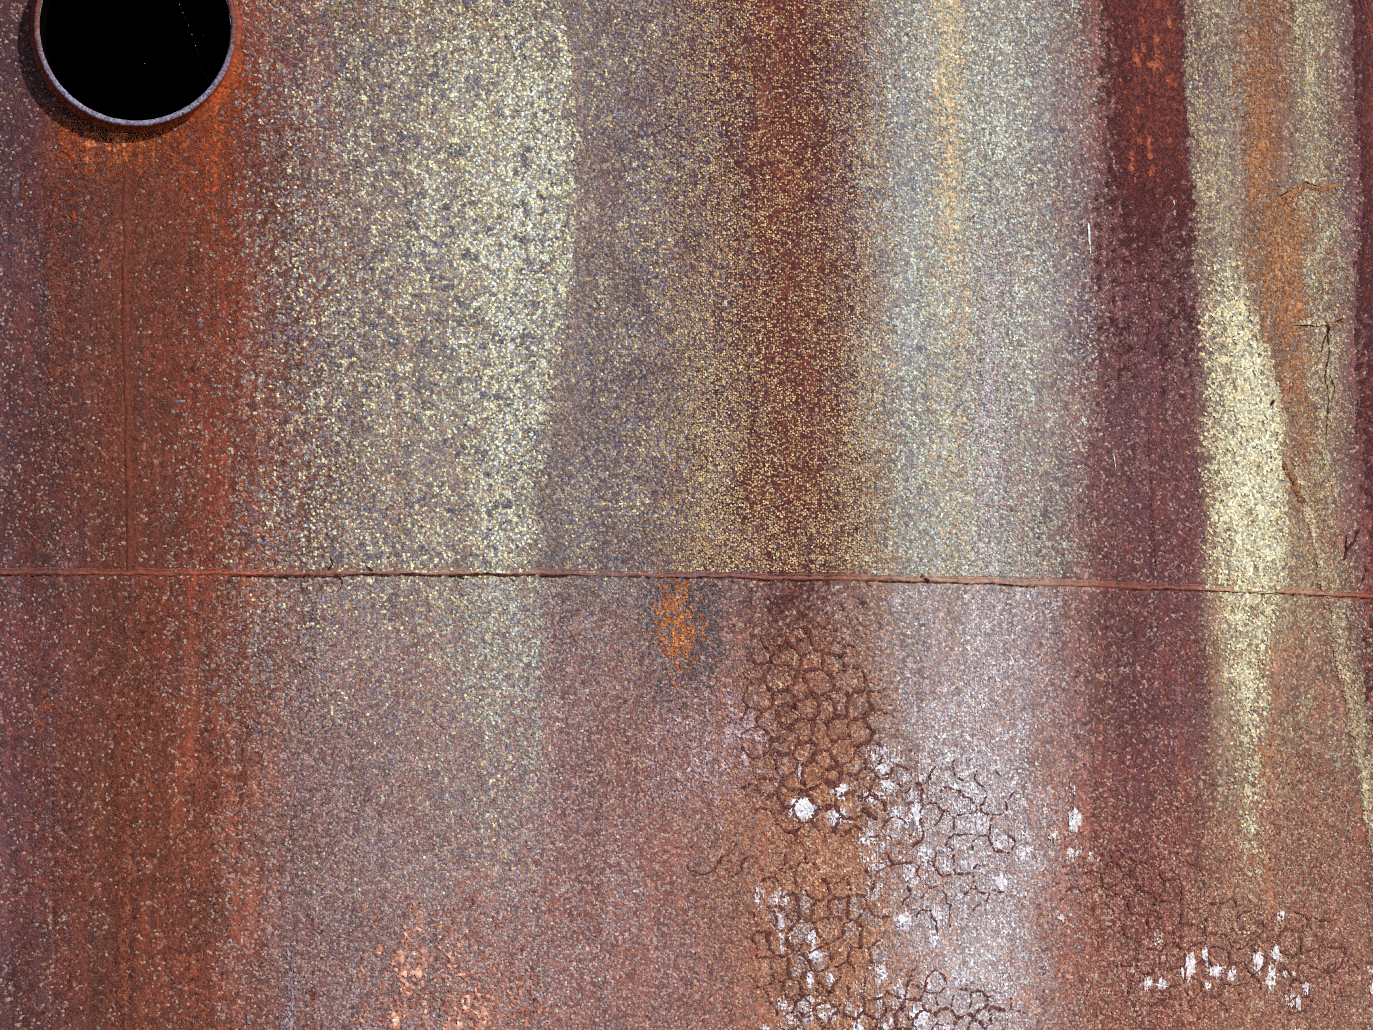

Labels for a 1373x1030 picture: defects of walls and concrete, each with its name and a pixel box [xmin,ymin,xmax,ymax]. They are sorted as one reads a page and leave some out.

rust [10,0,337,1030]
rust [346,893,550,1030]
rust [638,0,929,1030]
crack [687,624,1035,1030]
leakage [814,0,1111,1030]
rust [1036,0,1373,1030]
crack [1066,845,1361,1020]
leakage [1181,0,1373,1030]